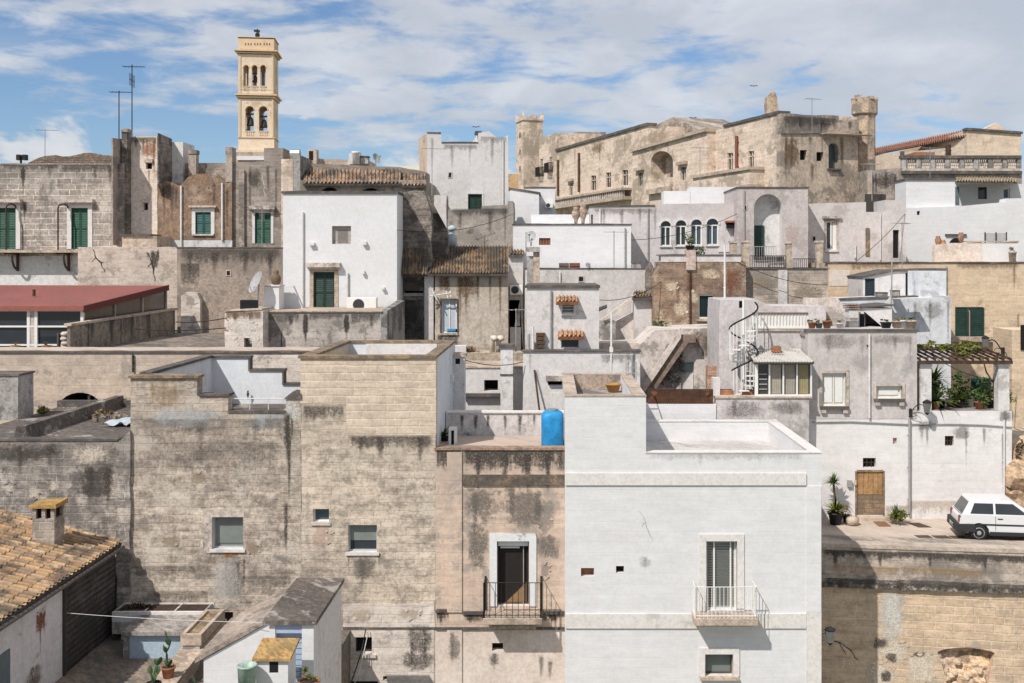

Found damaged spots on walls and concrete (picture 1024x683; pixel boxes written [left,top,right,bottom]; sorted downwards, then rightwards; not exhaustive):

water stain [1,446,58,465]
water stain [253,401,343,482]
water stain [352,436,564,475]
water stain [78,467,113,498]
water stain [468,488,542,566]
water stain [537,535,558,557]
rust [37,612,46,644]
water stain [404,629,430,669]
spalling [865,636,991,683]